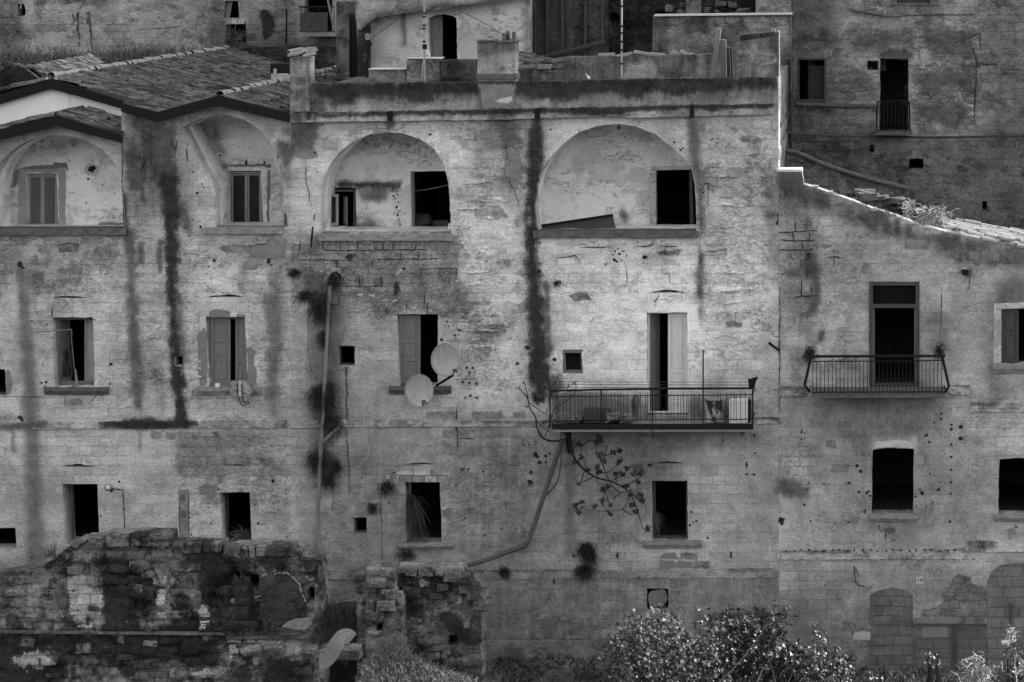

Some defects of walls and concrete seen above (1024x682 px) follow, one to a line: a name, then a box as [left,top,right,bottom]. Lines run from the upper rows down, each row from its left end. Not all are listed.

water stain [6,293,46,560]
water stain [99,127,198,446]
water stain [279,76,776,415]
spalling [922,574,987,624]